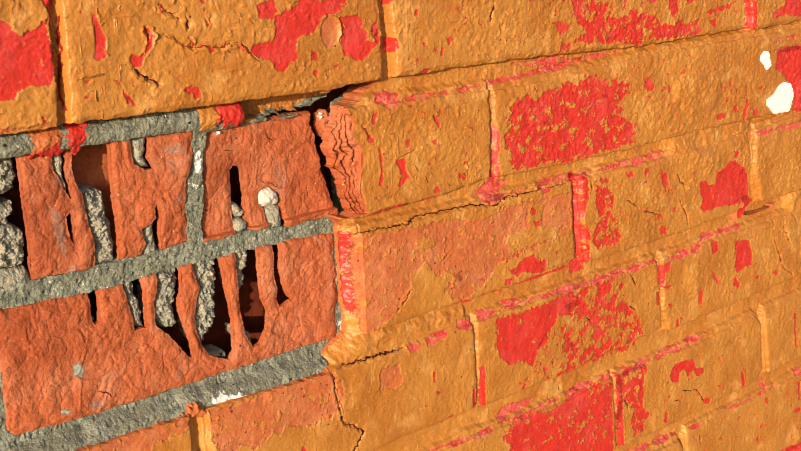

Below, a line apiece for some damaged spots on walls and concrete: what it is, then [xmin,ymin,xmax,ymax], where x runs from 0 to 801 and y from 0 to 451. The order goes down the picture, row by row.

peeling [92,8,110,61]
peeling [118,26,158,87]
crack [145,4,259,62]
peeling [224,0,399,72]
peeling [372,0,761,126]
peeling [771,0,801,18]
crack [354,183,566,235]
spalling [0,66,710,451]
peeling [456,149,758,389]
crack [332,347,403,451]
peeling [722,367,801,451]